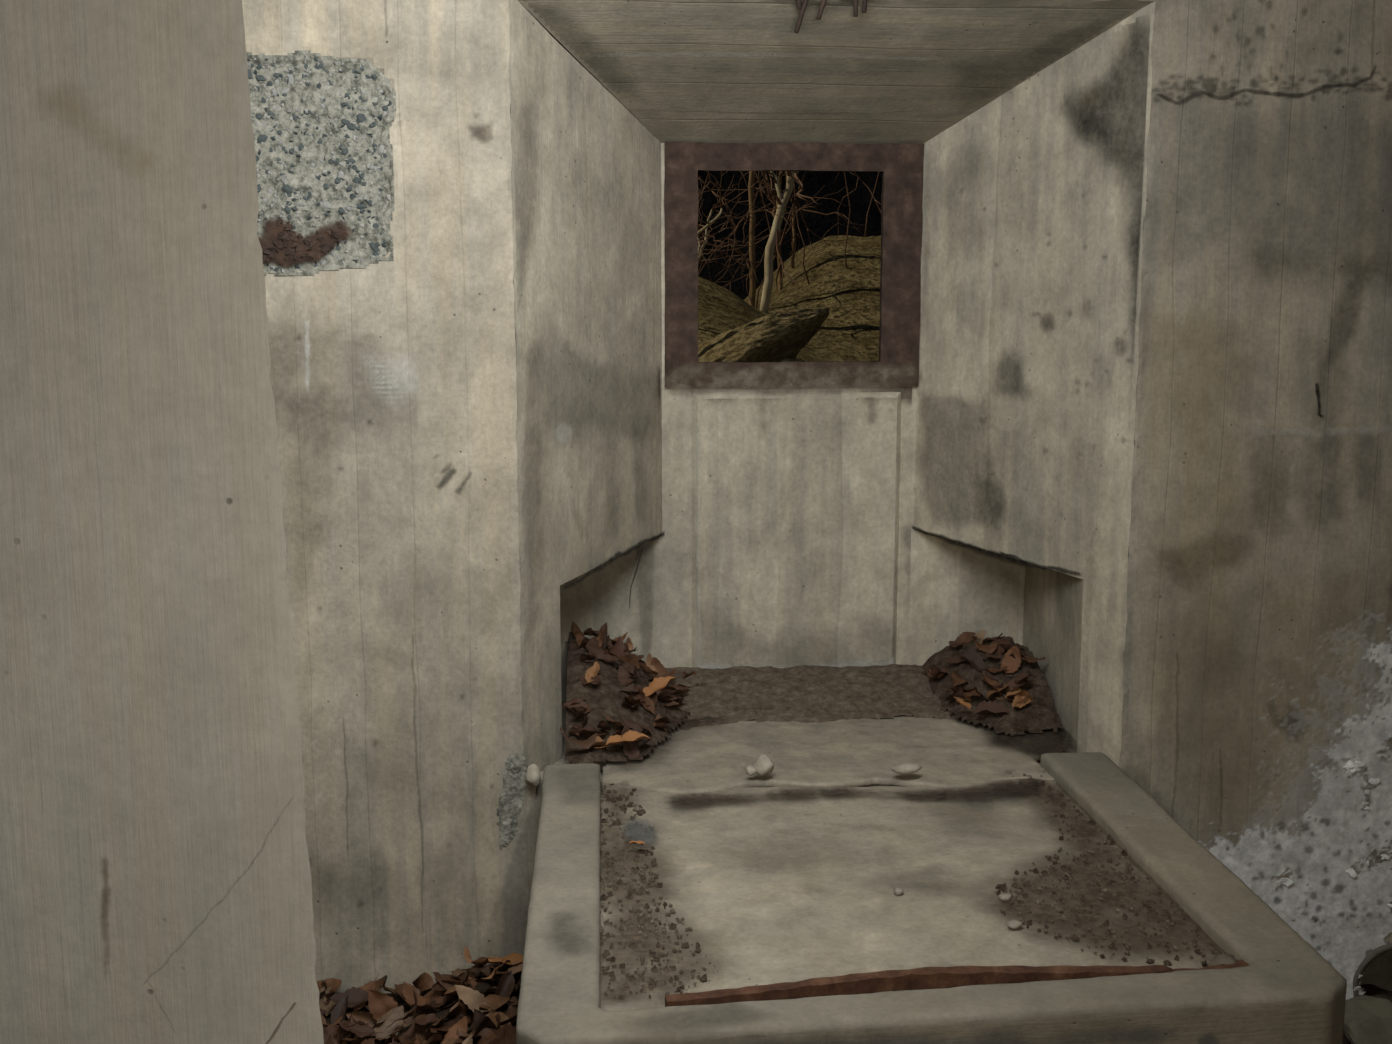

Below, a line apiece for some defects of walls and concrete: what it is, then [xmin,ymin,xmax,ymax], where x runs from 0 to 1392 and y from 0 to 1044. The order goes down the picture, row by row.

crack [1161,78,1369,102]
spalling [247,50,396,276]
corrosion [258,218,352,267]